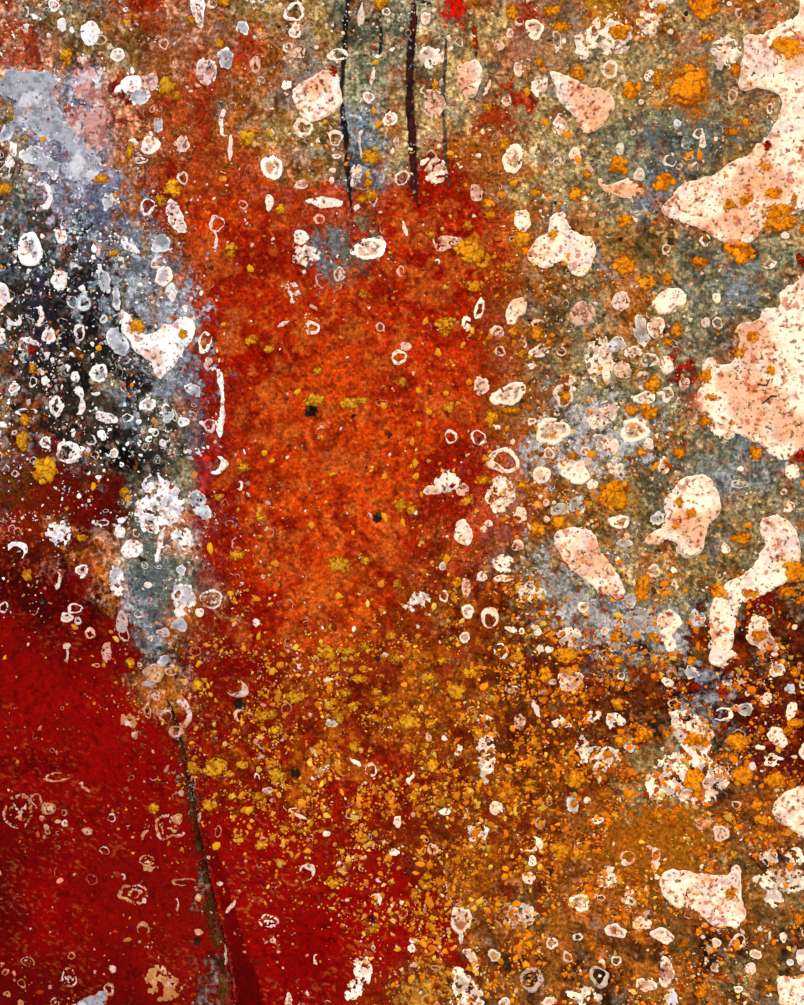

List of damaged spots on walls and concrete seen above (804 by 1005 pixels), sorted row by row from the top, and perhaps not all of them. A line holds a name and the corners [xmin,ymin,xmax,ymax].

crack [340,0,353,213]
crack [377,26,385,55]
crack [405,0,432,208]
crack [441,38,450,186]
crack [471,26,479,57]
peeling [661,0,804,245]
peeling [489,297,527,337]
peeling [554,274,804,668]
peeling [552,715,636,774]
peeling [583,711,626,729]
peeling [723,678,772,716]
crack [167,699,235,1005]